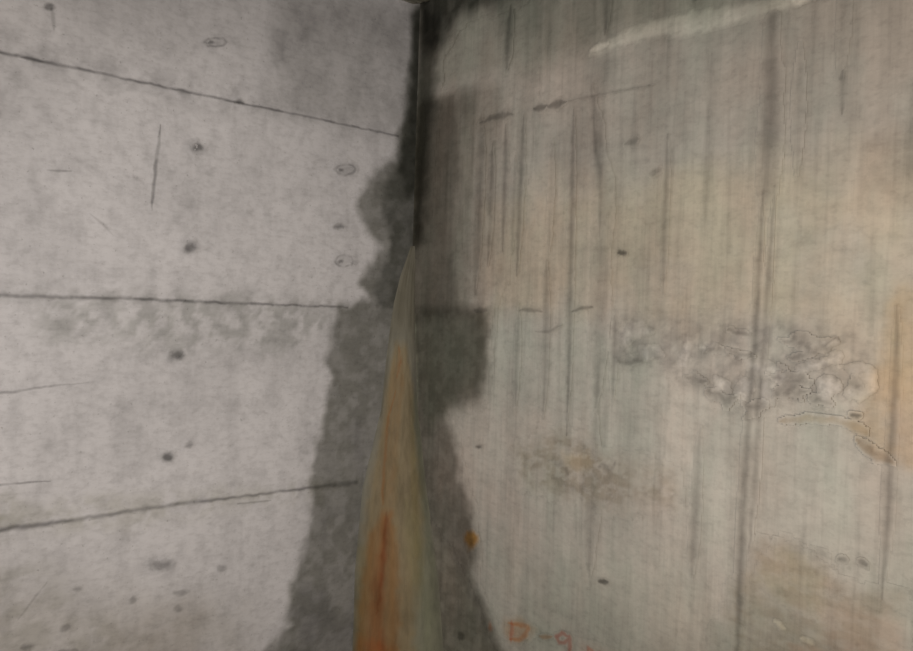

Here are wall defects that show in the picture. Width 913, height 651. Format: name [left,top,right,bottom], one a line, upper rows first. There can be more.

leakage [701,100,713,227]
leakage [246,0,541,651]
leakage [505,82,704,580]
corrosion [352,336,428,651]
corrosion [462,527,481,554]